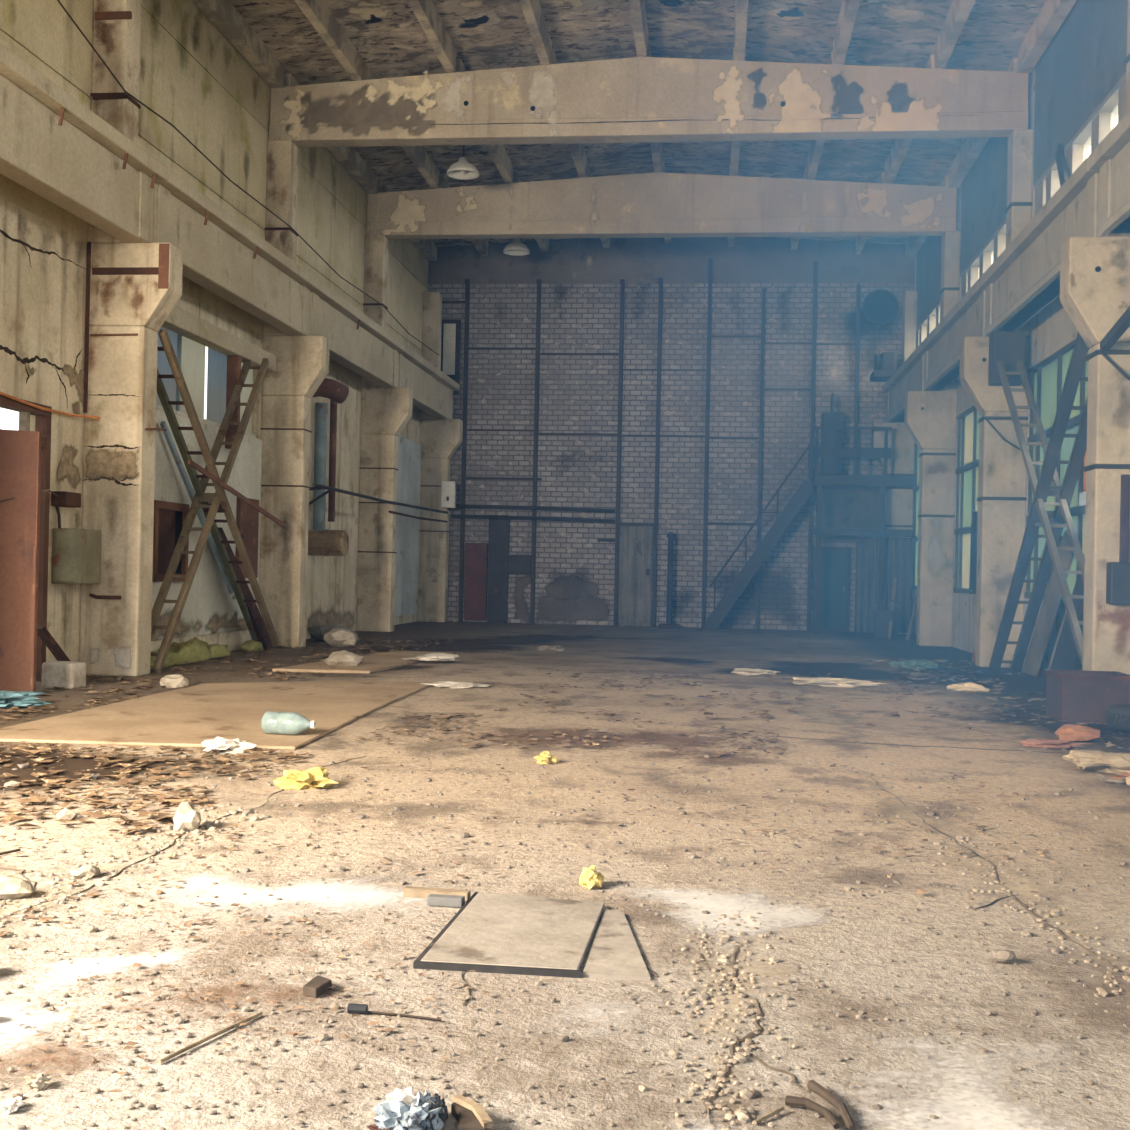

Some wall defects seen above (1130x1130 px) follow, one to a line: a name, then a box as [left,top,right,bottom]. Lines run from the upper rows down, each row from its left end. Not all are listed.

peeling [275,71,444,140]
peeling [713,65,943,133]
crack [0,229,85,269]
crack [0,345,139,406]
crack [0,789,284,919]
crack [871,777,1125,976]
crack [685,893,808,1130]